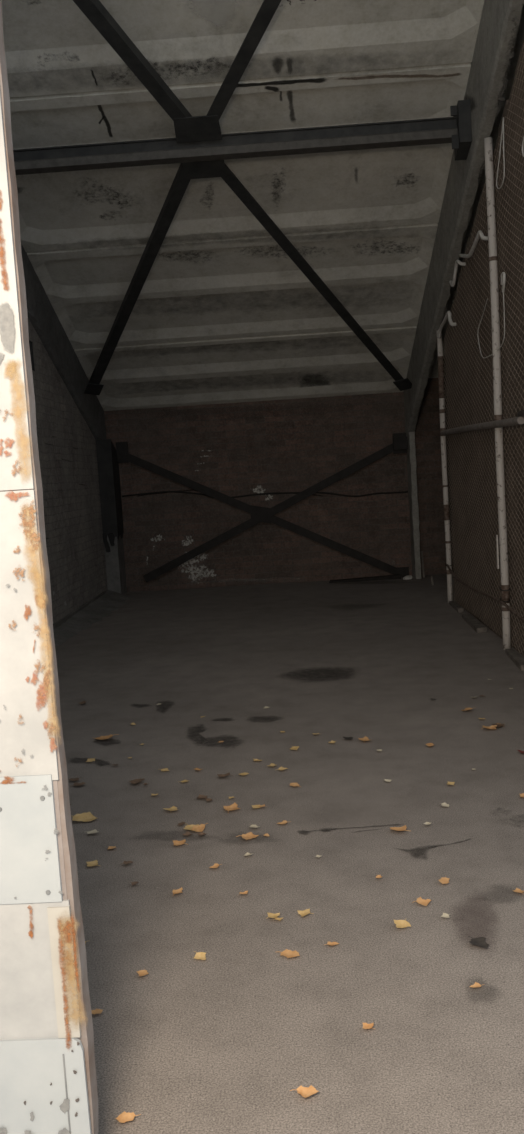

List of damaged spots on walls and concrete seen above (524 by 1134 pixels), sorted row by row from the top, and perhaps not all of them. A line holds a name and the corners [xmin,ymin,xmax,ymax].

crack [91,70,112,137]
leakage [237,59,460,121]
corrosion [0,362,30,476]
efflorescence [180,536,216,583]
corrosion [5,491,57,752]
corrosion [58,917,84,1048]